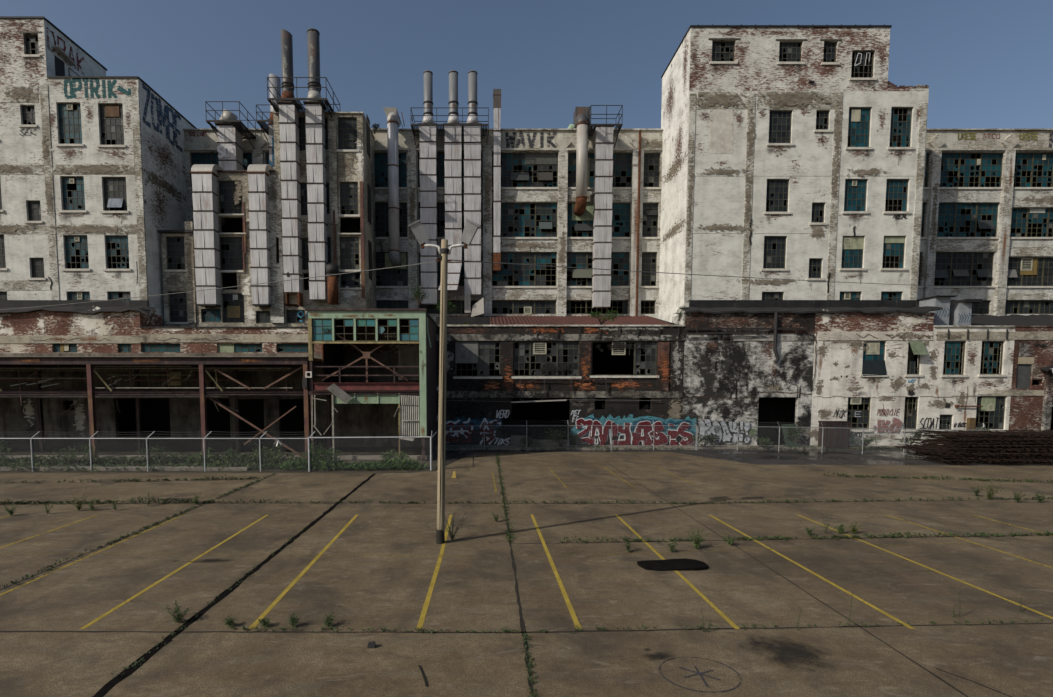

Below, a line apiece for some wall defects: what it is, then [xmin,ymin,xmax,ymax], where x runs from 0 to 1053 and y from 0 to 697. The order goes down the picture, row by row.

peeling [0,21,44,70]
spalling [4,81,62,102]
spalling [646,29,889,263]
spalling [0,113,187,235]
spalling [736,271,800,285]
spalling [449,326,612,341]
spalling [562,352,682,390]
spalling [667,399,683,420]